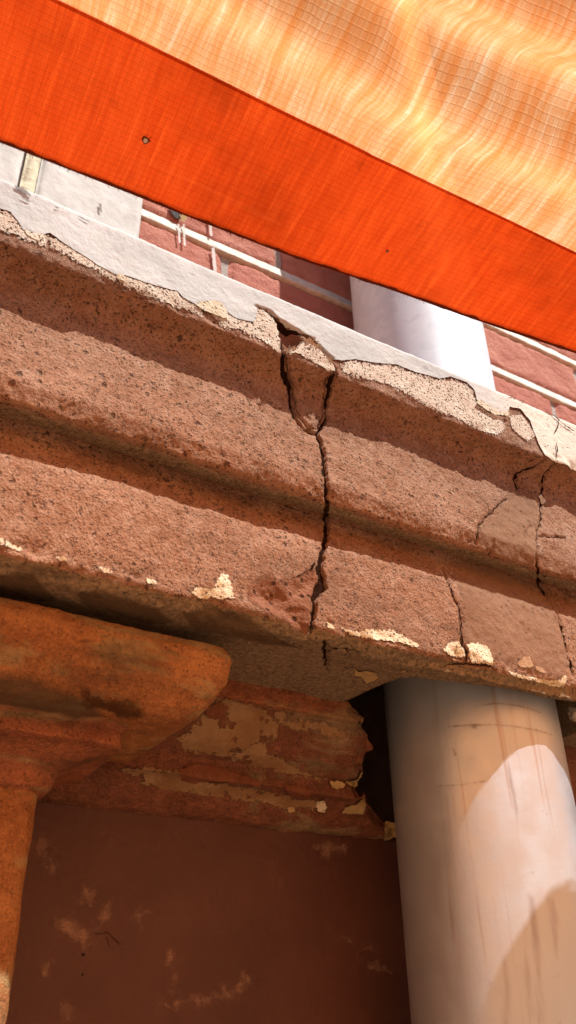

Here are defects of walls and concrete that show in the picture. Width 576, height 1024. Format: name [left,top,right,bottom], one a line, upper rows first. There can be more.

peeling [0,208,535,442]
peeling [192,573,235,600]
crack [263,310,351,669]
peeling [327,622,419,647]
crack [442,570,492,668]
peeling [443,641,493,666]
crack [476,411,576,675]
peeling [121,698,366,815]